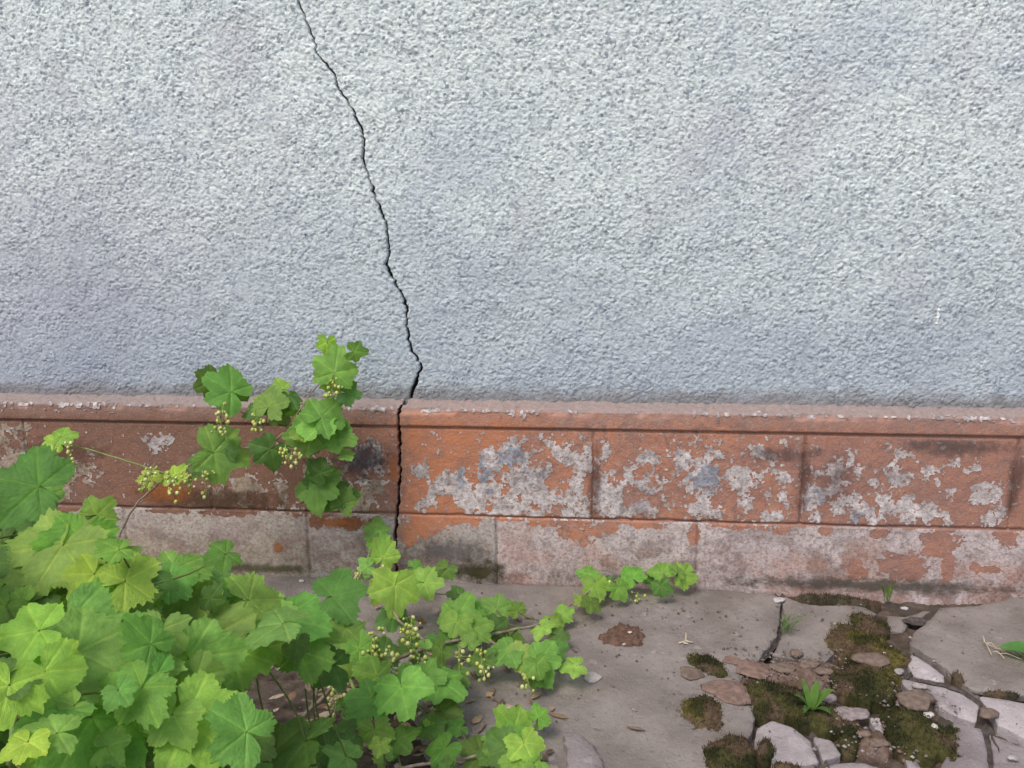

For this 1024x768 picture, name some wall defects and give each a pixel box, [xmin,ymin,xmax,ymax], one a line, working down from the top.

crack [299,0,423,571]
peeling [59,447,104,516]
peeling [0,399,178,468]
peeling [113,431,1024,606]